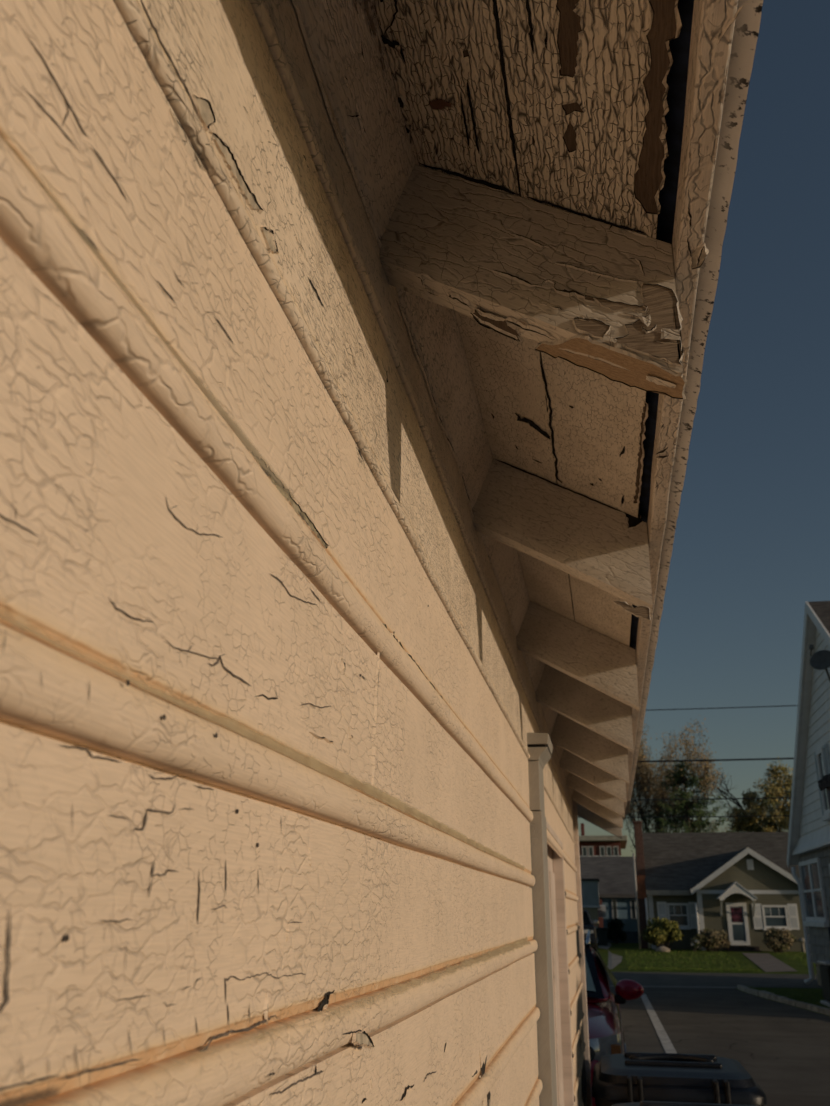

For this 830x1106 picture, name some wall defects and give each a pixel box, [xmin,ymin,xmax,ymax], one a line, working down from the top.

peeling [555,0,586,78]
peeling [562,99,586,153]
peeling [633,0,682,214]
crack [414,0,648,512]
peeling [469,307,522,342]
peeling [534,283,687,505]
crack [109,598,330,708]
crack [0,972,305,1091]
crack [317,990,335,1012]
crack [268,1066,323,1095]
crack [400,1044,446,1101]
crack [472,1044,491,1106]